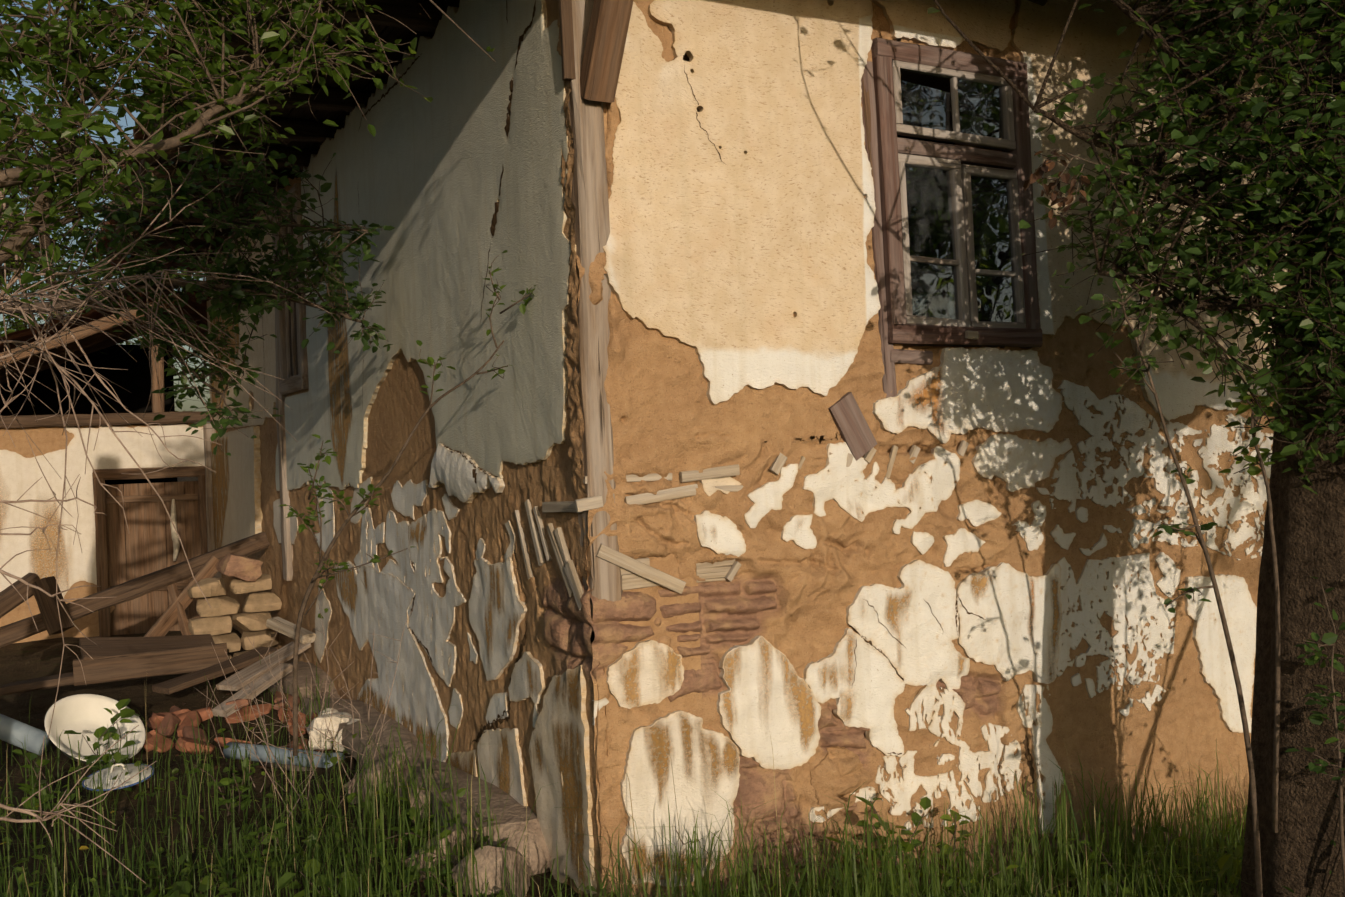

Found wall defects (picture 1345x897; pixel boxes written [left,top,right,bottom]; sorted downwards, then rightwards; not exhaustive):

spalling [545,0,561,56]
spalling [634,0,675,62]
crack [480,0,536,322]
crack [684,67,724,163]
spalling [216,80,1275,897]